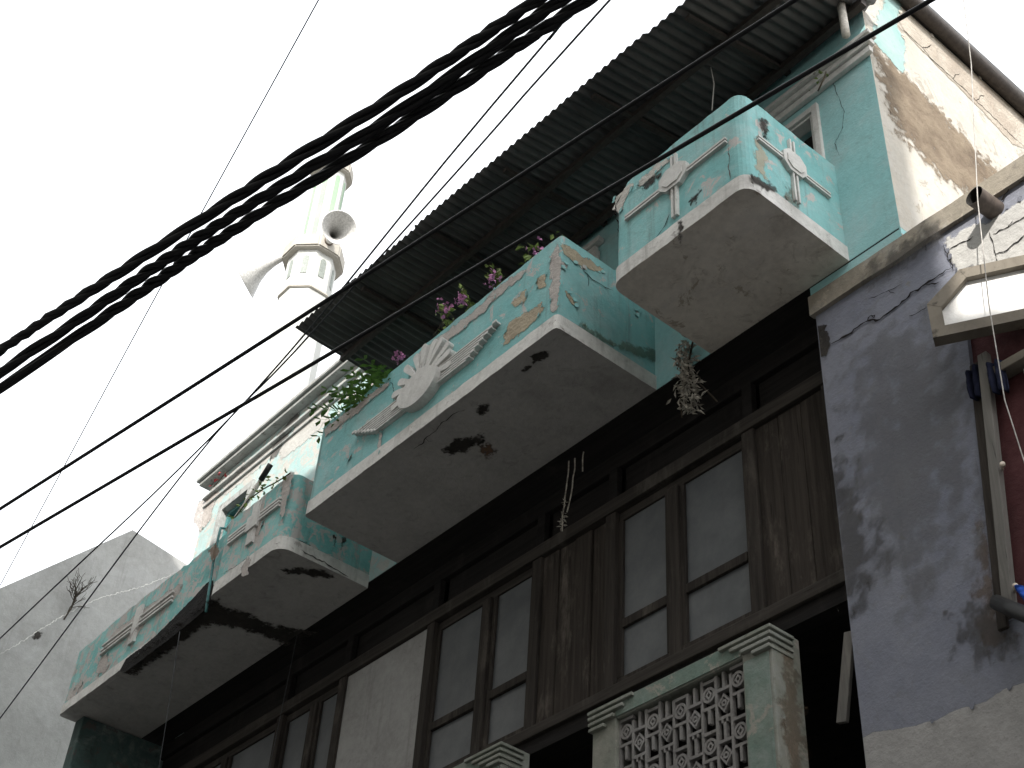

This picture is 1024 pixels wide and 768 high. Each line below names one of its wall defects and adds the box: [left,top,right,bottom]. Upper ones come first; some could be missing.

flaking render [873,0,1024,148]
peeling [612,156,670,213]
peeling [419,243,606,355]
crack [831,180,1024,344]
damp [441,434,496,456]
peeling [208,543,219,562]
damp [280,567,334,579]
flaking render [95,580,214,676]
damp [125,599,320,675]
flaking render [863,683,1024,768]